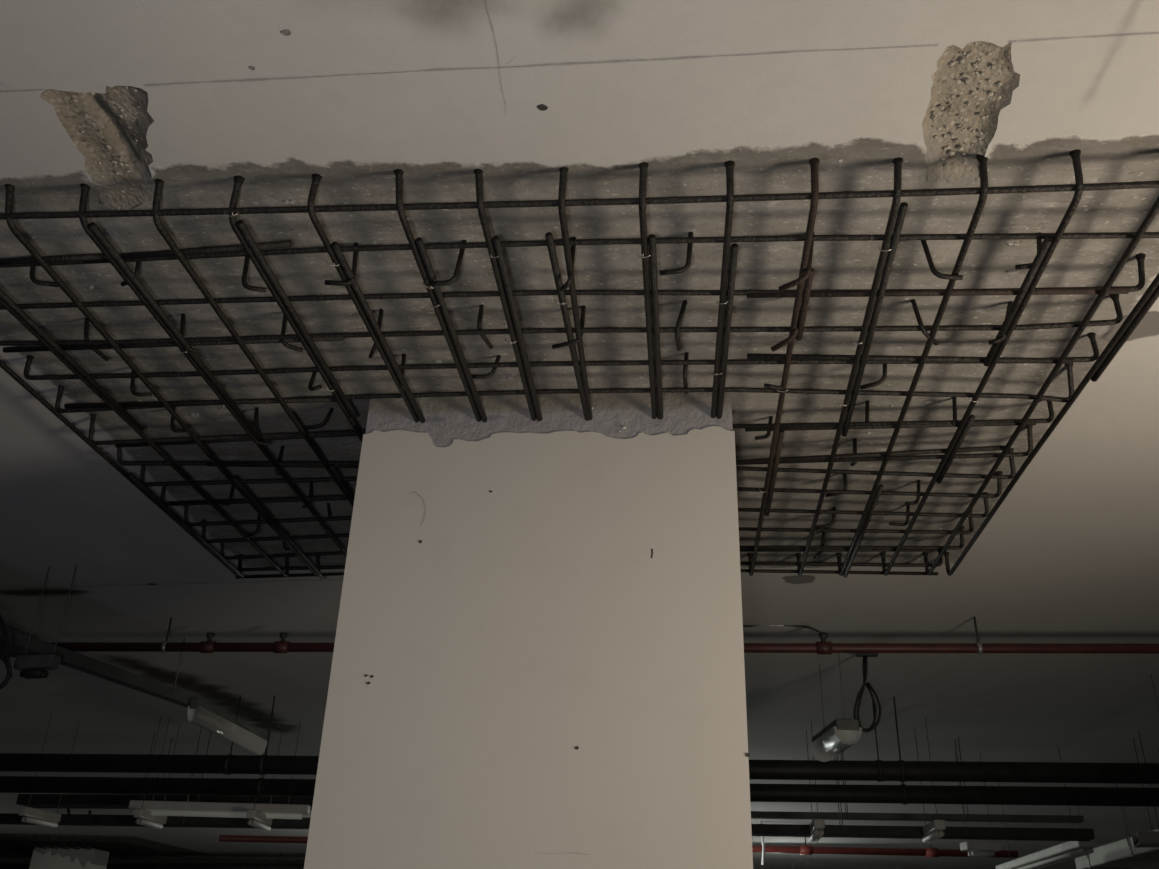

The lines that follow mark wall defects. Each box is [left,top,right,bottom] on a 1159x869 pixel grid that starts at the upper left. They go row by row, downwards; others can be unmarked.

spalling [0,41,1159,580]